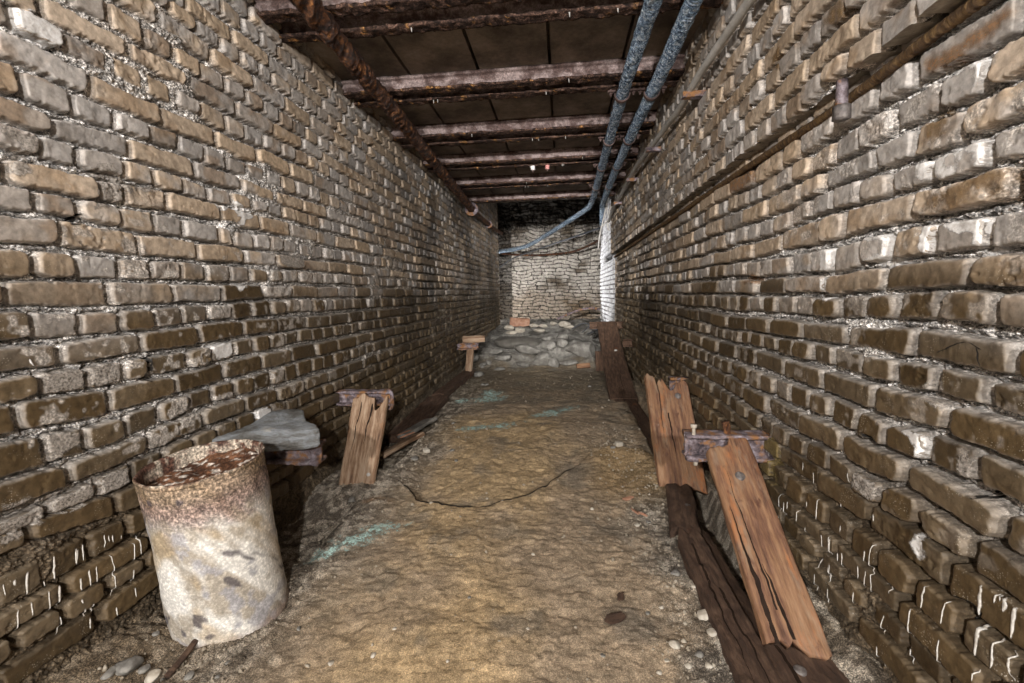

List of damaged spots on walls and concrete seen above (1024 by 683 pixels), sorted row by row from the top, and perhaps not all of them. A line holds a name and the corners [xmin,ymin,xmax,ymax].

crack [403,468,573,508]
leakage [847,469,890,500]
leakage [957,453,991,493]
leakage [3,572,33,629]
leakage [75,545,98,628]
leakage [104,535,142,597]
leakage [910,533,930,560]
leakage [971,586,1016,681]